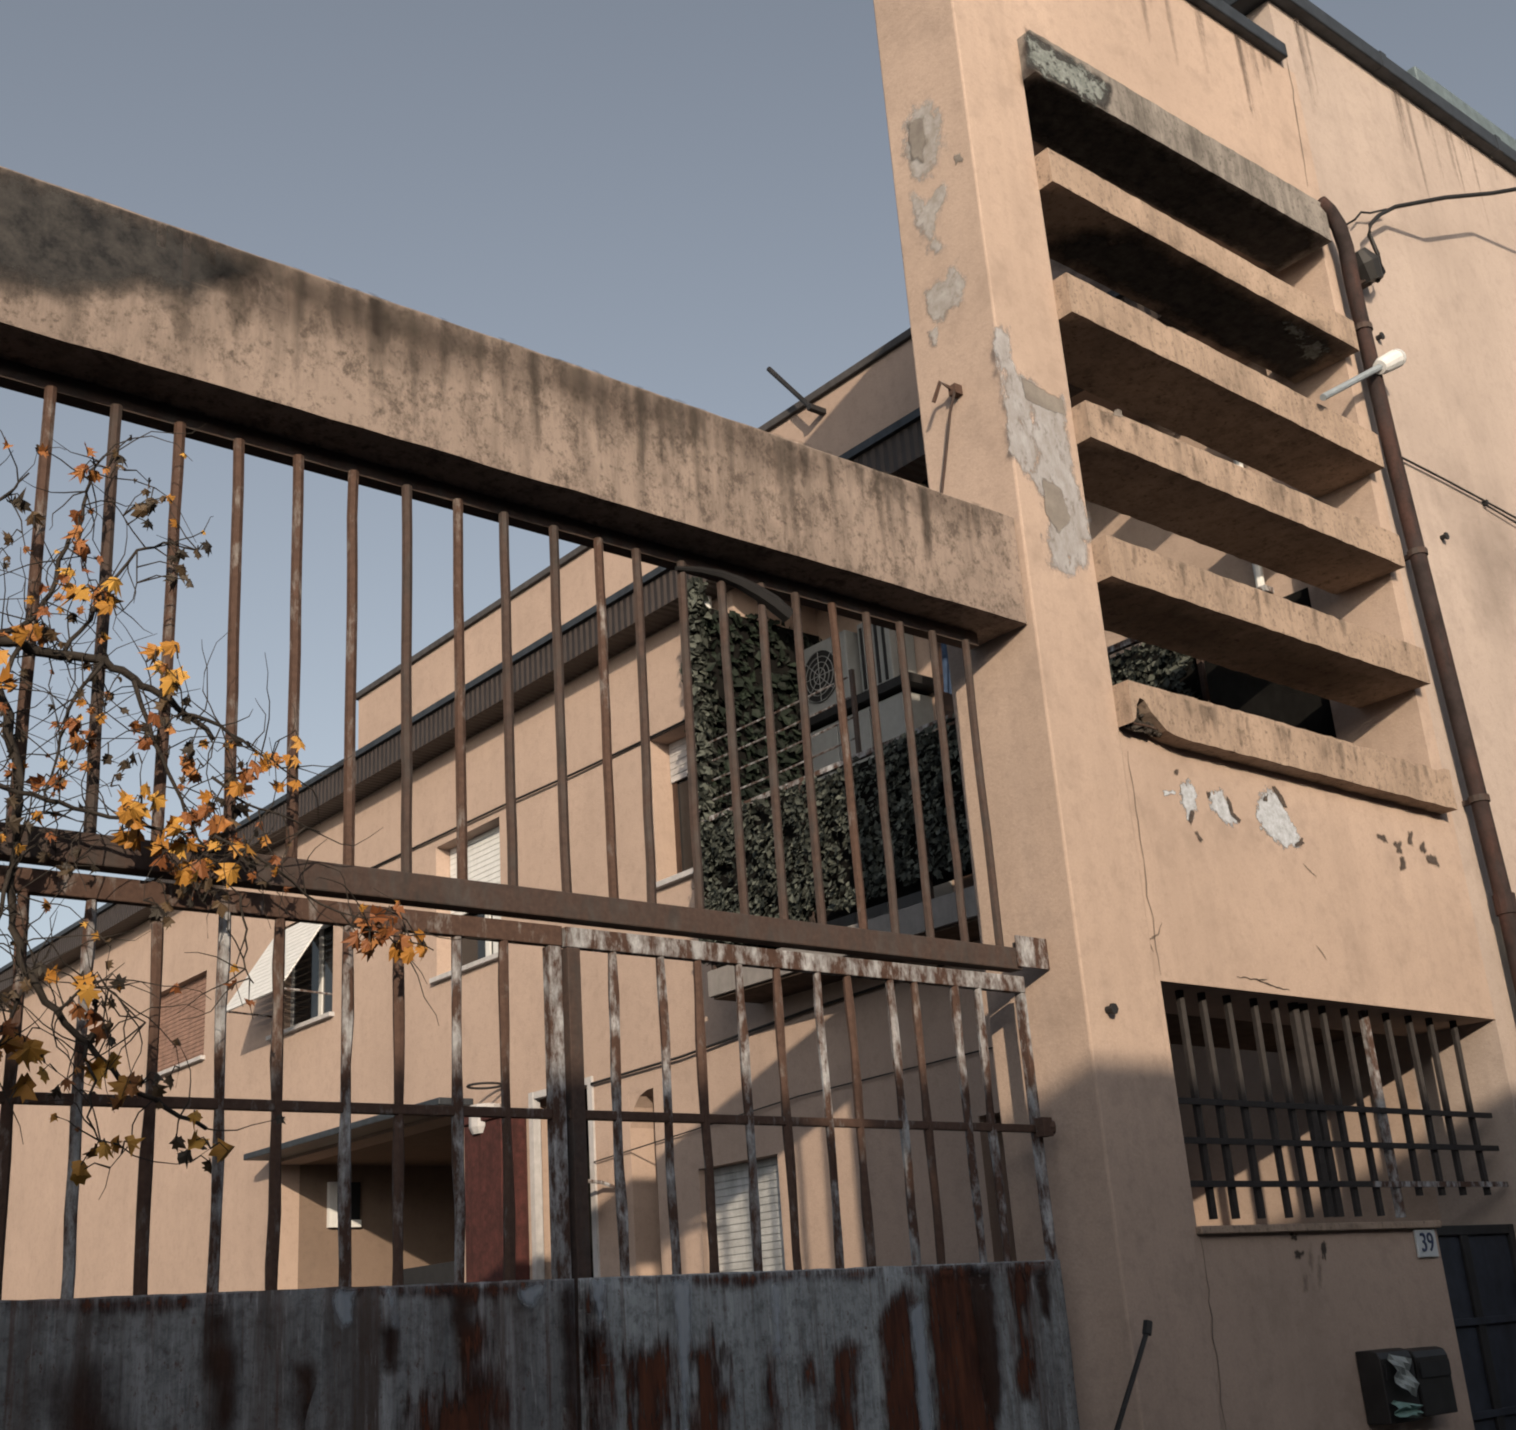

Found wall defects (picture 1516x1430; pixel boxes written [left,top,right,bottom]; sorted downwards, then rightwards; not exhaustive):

damp [0,167,263,298]
peeling [903,103,963,253]
peeling [993,327,1091,575]
peeling [1163,769,1304,852]
corrosion [619,1268,880,1288]
corrosion [28,1293,253,1430]
corrosion [296,1366,314,1430]
corrosion [342,1281,733,1430]
corrosion [766,1340,783,1430]
corrosion [798,1338,863,1430]
corrosion [879,1261,1055,1430]